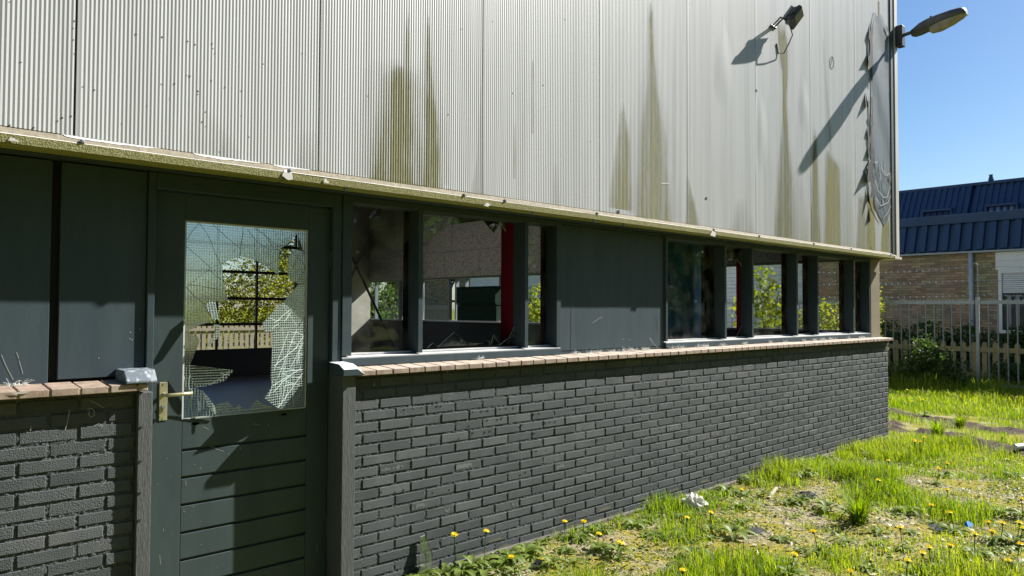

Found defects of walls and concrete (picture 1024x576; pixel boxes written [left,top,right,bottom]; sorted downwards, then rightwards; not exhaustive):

water stain [354,13,450,185]
water stain [768,21,846,244]